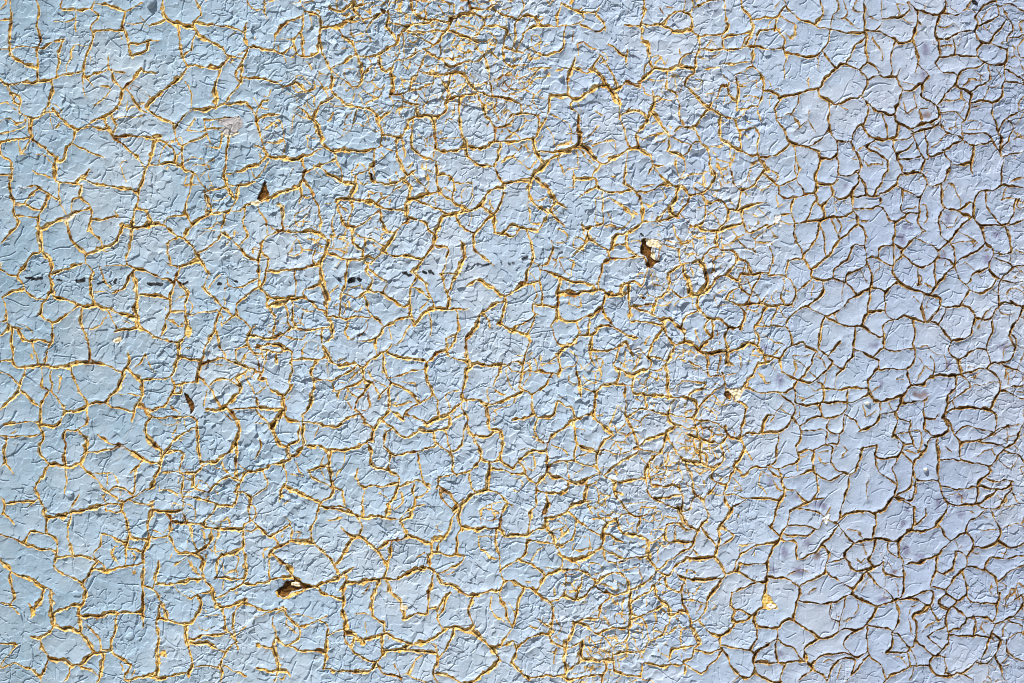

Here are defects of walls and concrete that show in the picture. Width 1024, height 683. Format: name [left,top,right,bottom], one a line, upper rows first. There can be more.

crack [247,0,275,18]
crack [437,0,455,14]
crack [838,0,859,29]
crack [608,43,628,66]
crack [705,61,747,70]
crack [963,71,983,87]
crack [945,91,967,111]
peeling [251,182,270,206]
crack [751,229,773,247]
peeling [641,238,661,268]
crack [553,256,575,277]
peeling [276,577,312,599]